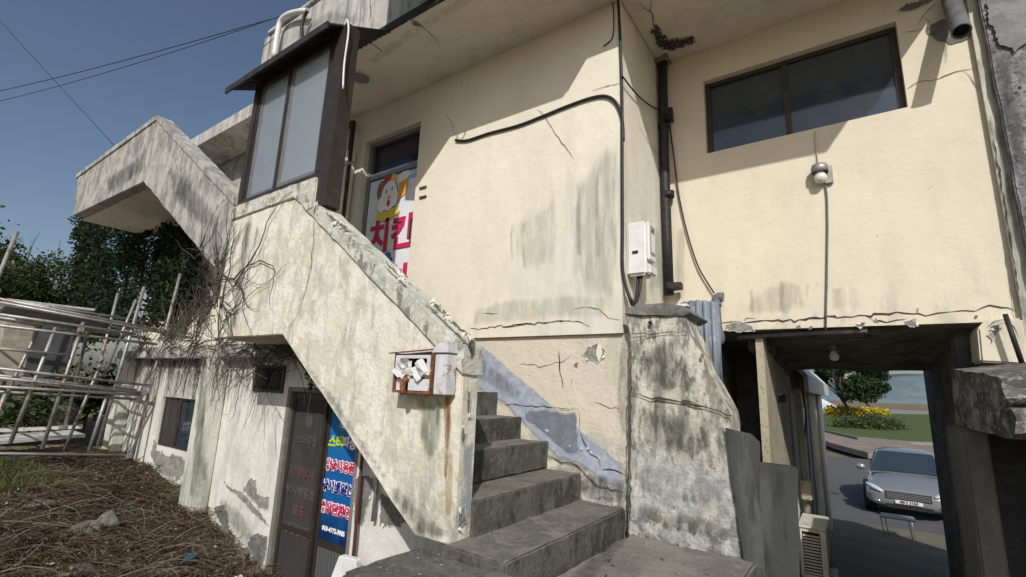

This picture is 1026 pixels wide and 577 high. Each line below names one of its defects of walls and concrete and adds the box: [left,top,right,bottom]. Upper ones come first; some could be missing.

crack [723,120,1024,338]
flaking render [574,343,606,367]
crack [470,307,732,525]
peeling [214,504,235,538]
peeling [223,477,269,568]